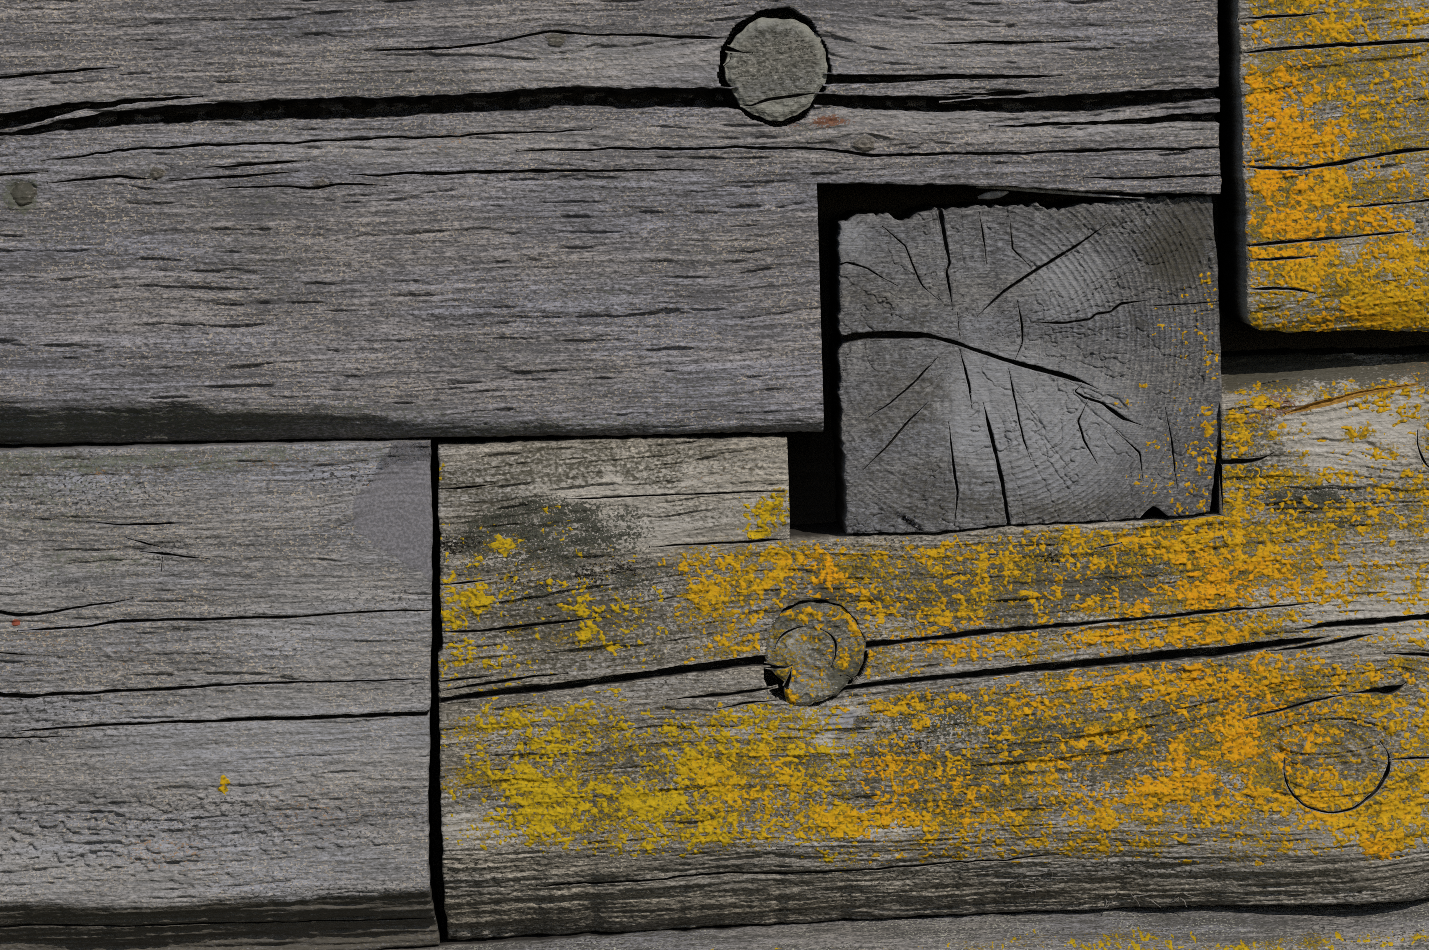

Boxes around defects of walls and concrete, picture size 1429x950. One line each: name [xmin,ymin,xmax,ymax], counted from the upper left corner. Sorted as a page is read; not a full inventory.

crack [0,66,119,80]
crack [364,29,752,67]
crack [740,39,1089,108]
crack [1239,11,1429,55]
crack [0,111,1429,191]
crack [841,198,1429,525]
crack [439,483,494,491]
crack [565,490,784,501]
crack [87,520,209,571]
crack [650,537,787,549]
crack [0,578,595,657]
crack [0,672,567,740]